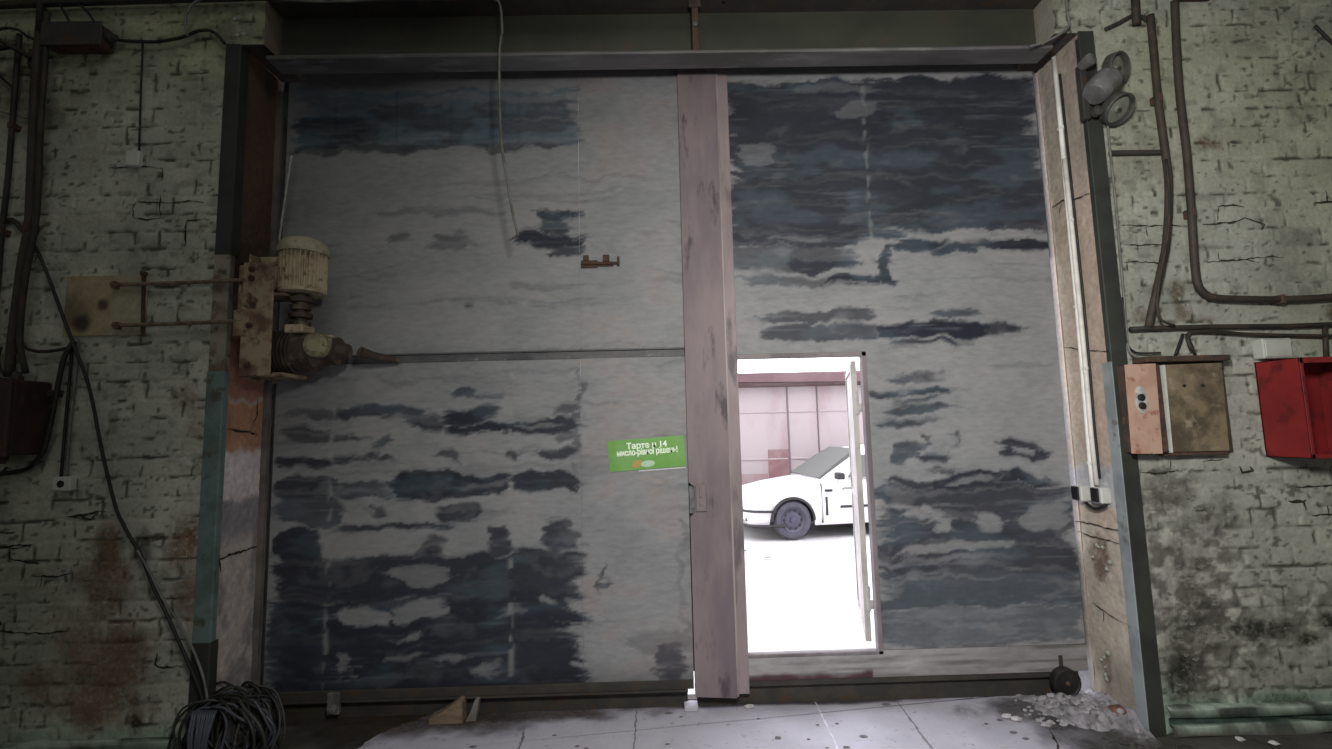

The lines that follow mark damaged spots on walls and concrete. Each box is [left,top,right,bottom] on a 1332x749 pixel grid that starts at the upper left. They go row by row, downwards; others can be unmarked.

water stain [1230,620,1285,637]
water stain [1303,613,1332,644]